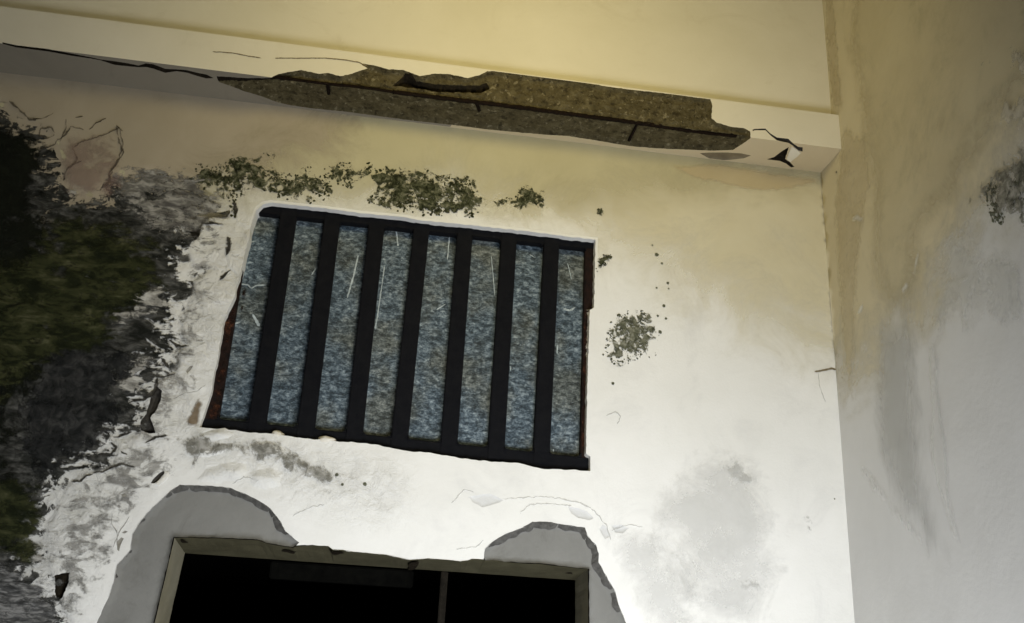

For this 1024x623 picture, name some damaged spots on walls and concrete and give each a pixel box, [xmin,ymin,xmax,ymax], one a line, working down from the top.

crack [9,101,124,190]
crack [2,42,367,78]
spalling [217,63,751,160]
water stain [238,0,1024,374]
crack [753,129,803,167]
water stain [0,102,234,516]
rust [209,290,246,419]
water stain [0,515,115,623]
spalling [108,471,292,597]
spalling [489,507,629,619]